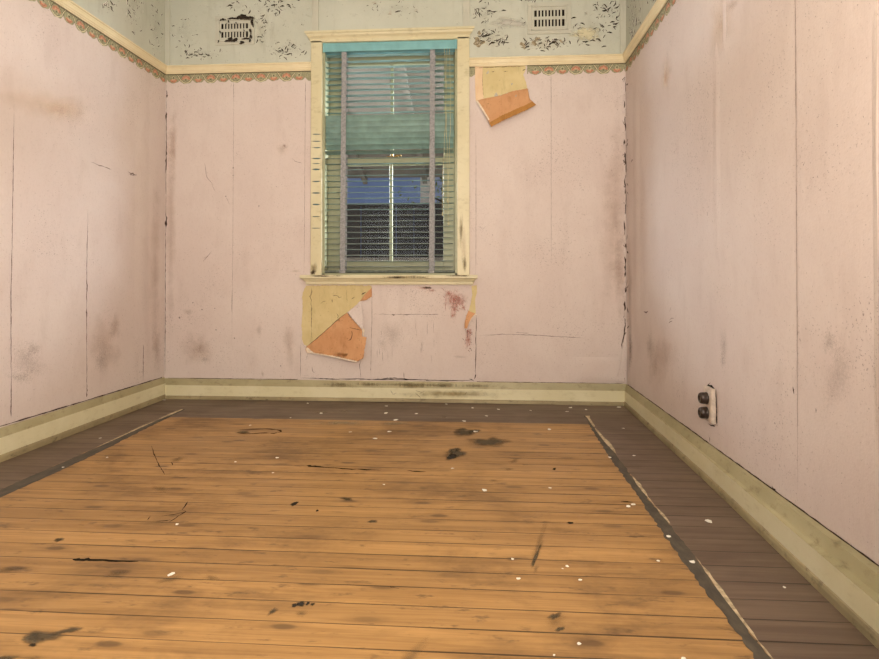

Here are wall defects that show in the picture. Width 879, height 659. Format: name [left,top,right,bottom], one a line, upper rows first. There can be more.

peeling [102,0,307,60]